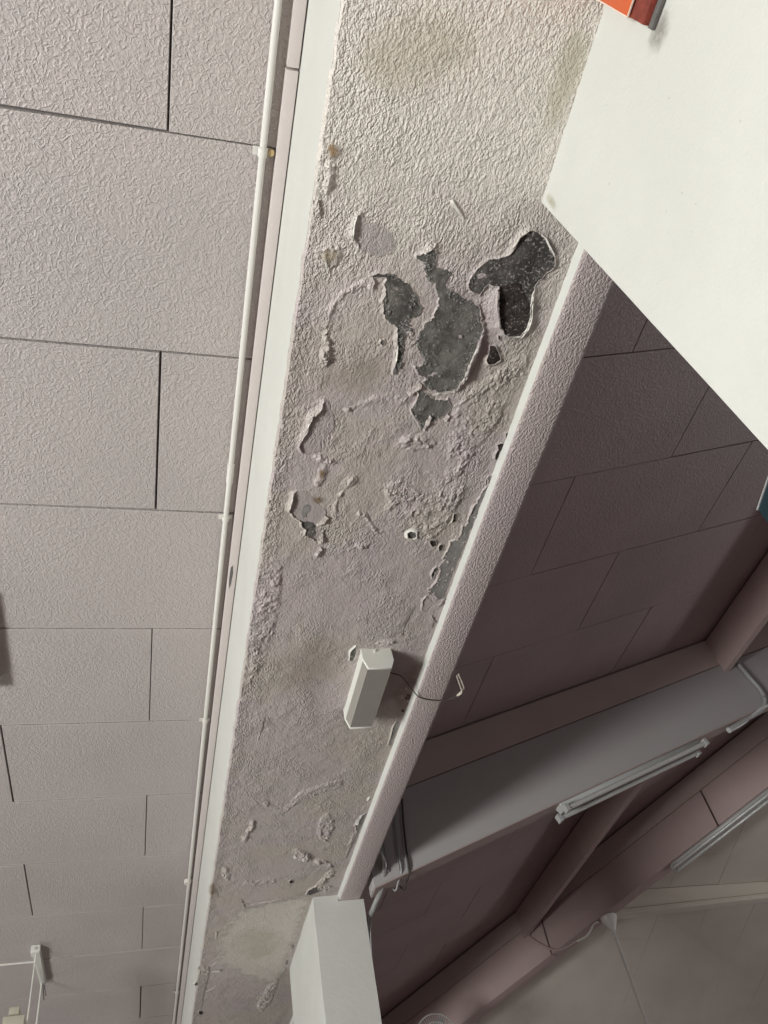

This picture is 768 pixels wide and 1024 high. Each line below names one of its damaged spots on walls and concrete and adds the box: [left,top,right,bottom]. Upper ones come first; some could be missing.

spalling [346,210,559,431]
peeling [295,397,339,464]
peeling [285,489,329,559]
peeling [404,431,509,628]
peeling [345,796,372,858]
spalling [305,883,337,896]